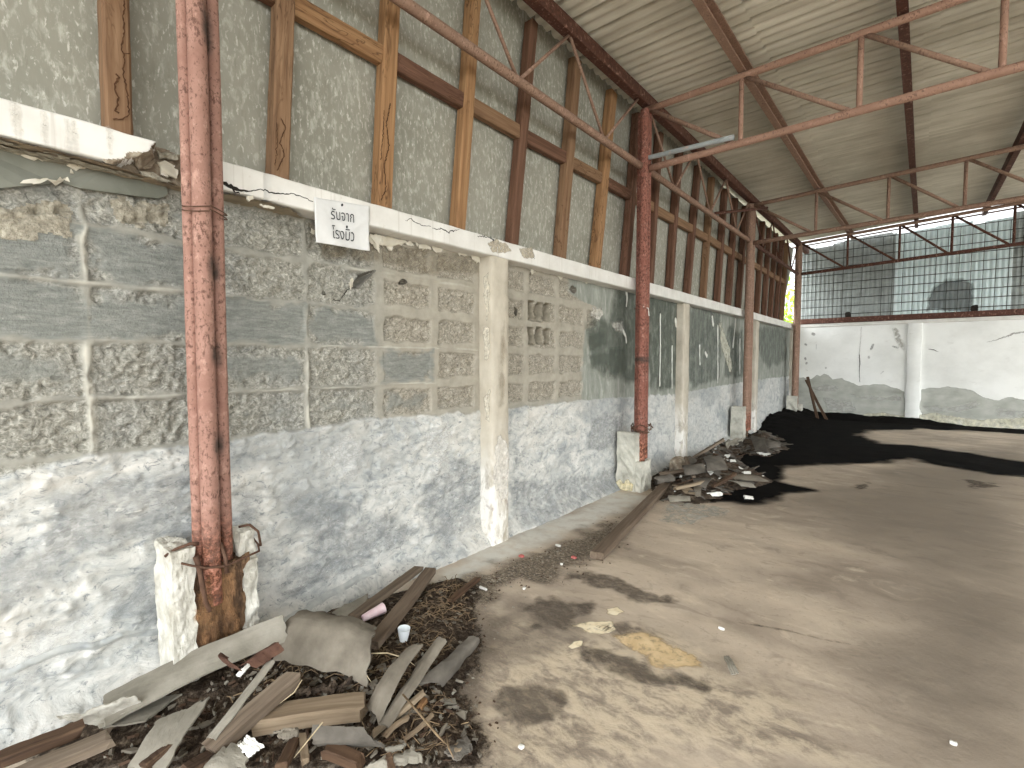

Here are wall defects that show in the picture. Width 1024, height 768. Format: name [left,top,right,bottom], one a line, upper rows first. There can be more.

flaking render [0,137,181,199]
crack [223,181,313,202]
crack [405,218,494,241]
peeling [488,239,536,276]
peeling [323,234,490,360]
water stain [589,290,636,381]
water stain [649,297,677,389]
peeling [494,436,509,499]
corrosion [193,551,250,648]